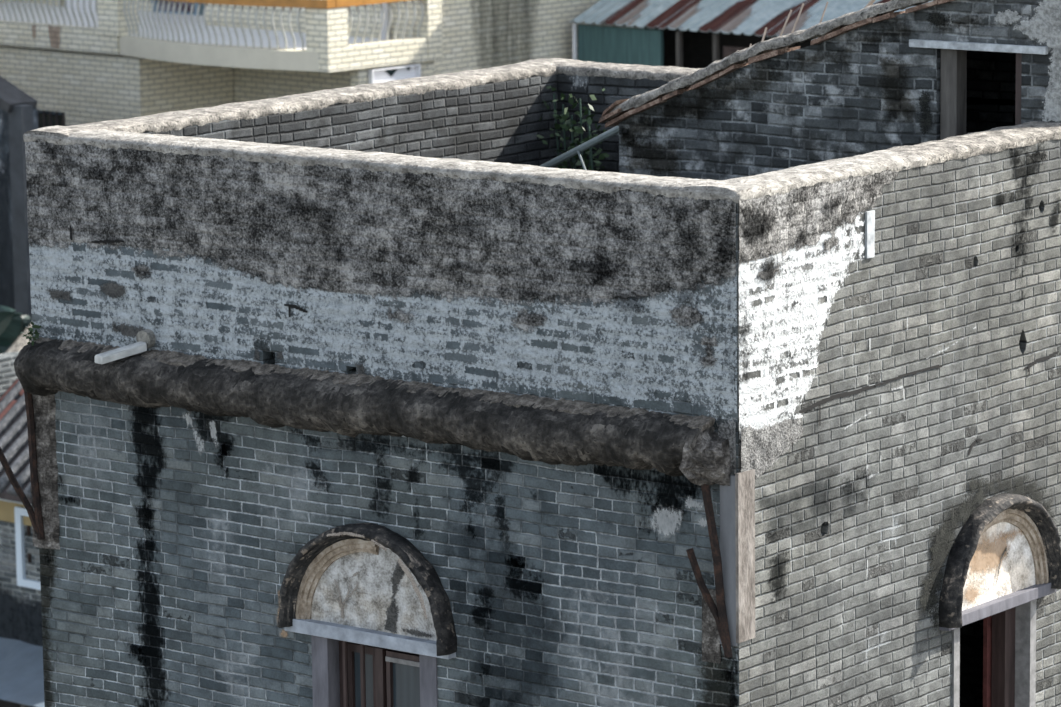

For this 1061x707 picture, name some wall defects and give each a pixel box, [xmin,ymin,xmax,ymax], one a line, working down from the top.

peeling [1047,75,1061,109]
damp [996,140,1045,302]
damp [1050,196,1061,233]
flaking render [25,139,911,479]
crack [794,365,942,426]
damp [183,411,234,478]
damp [306,462,330,492]
damp [338,435,544,599]
damp [590,464,701,535]
damp [125,405,171,707]
damp [473,588,494,631]